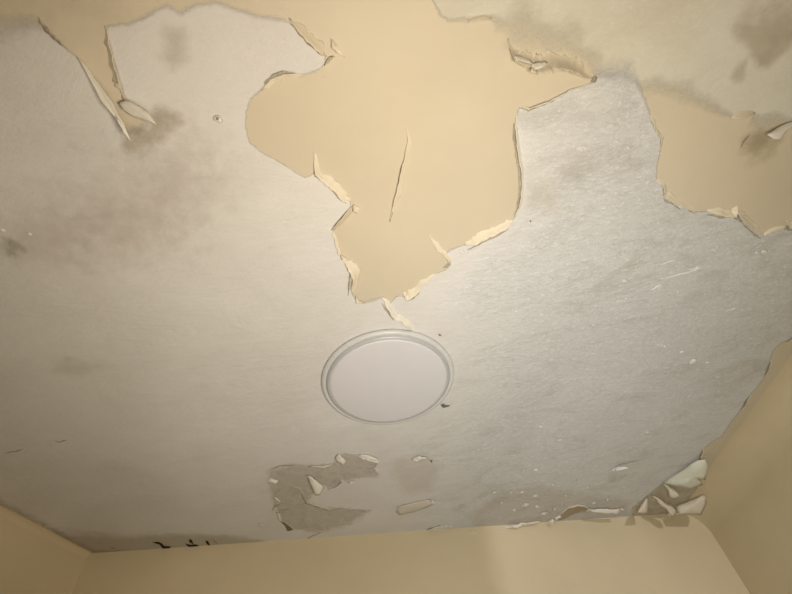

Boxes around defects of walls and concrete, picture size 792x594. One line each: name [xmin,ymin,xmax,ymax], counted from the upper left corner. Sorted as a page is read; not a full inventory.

peeling [288,17,327,57]
peeling [77,57,131,141]
peeling [104,25,156,124]
peeling [433,0,792,140]
peeling [313,152,352,202]
peeling [513,113,524,217]
peeling [464,219,513,246]
peeling [342,259,361,294]
peeling [403,273,437,301]
peeling [306,475,324,496]
peeling [555,504,625,520]
peeling [633,459,708,517]